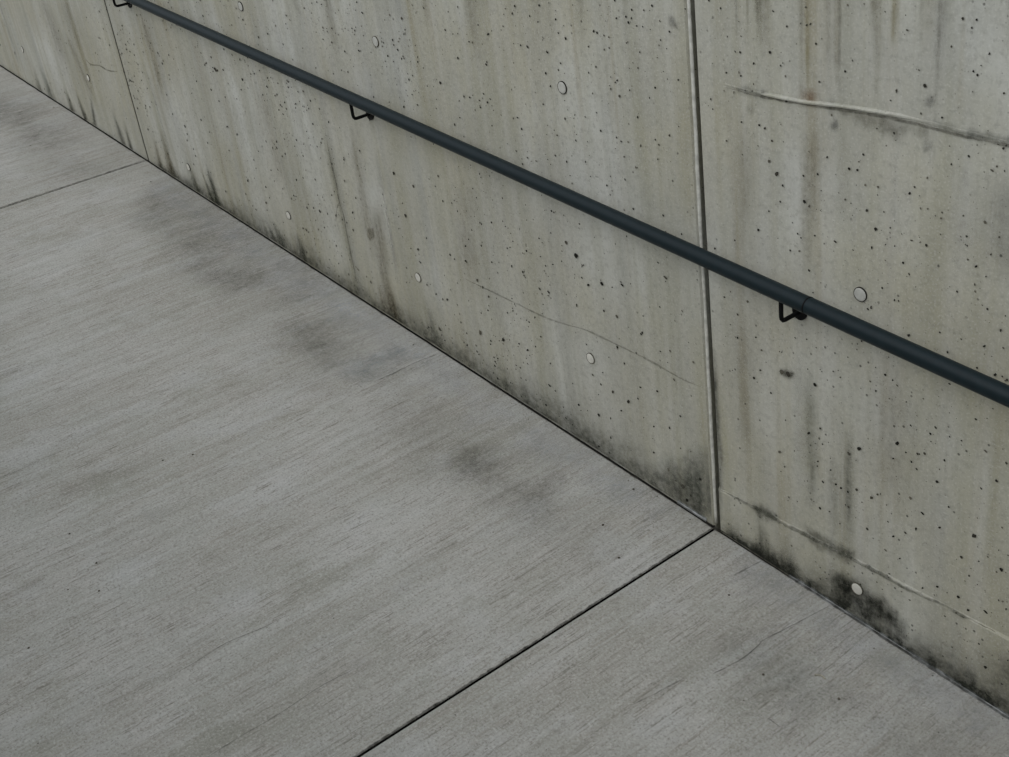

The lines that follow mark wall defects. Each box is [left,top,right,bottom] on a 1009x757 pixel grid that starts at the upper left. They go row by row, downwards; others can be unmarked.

crack [896,118,968,138]
damp [836,576,897,627]